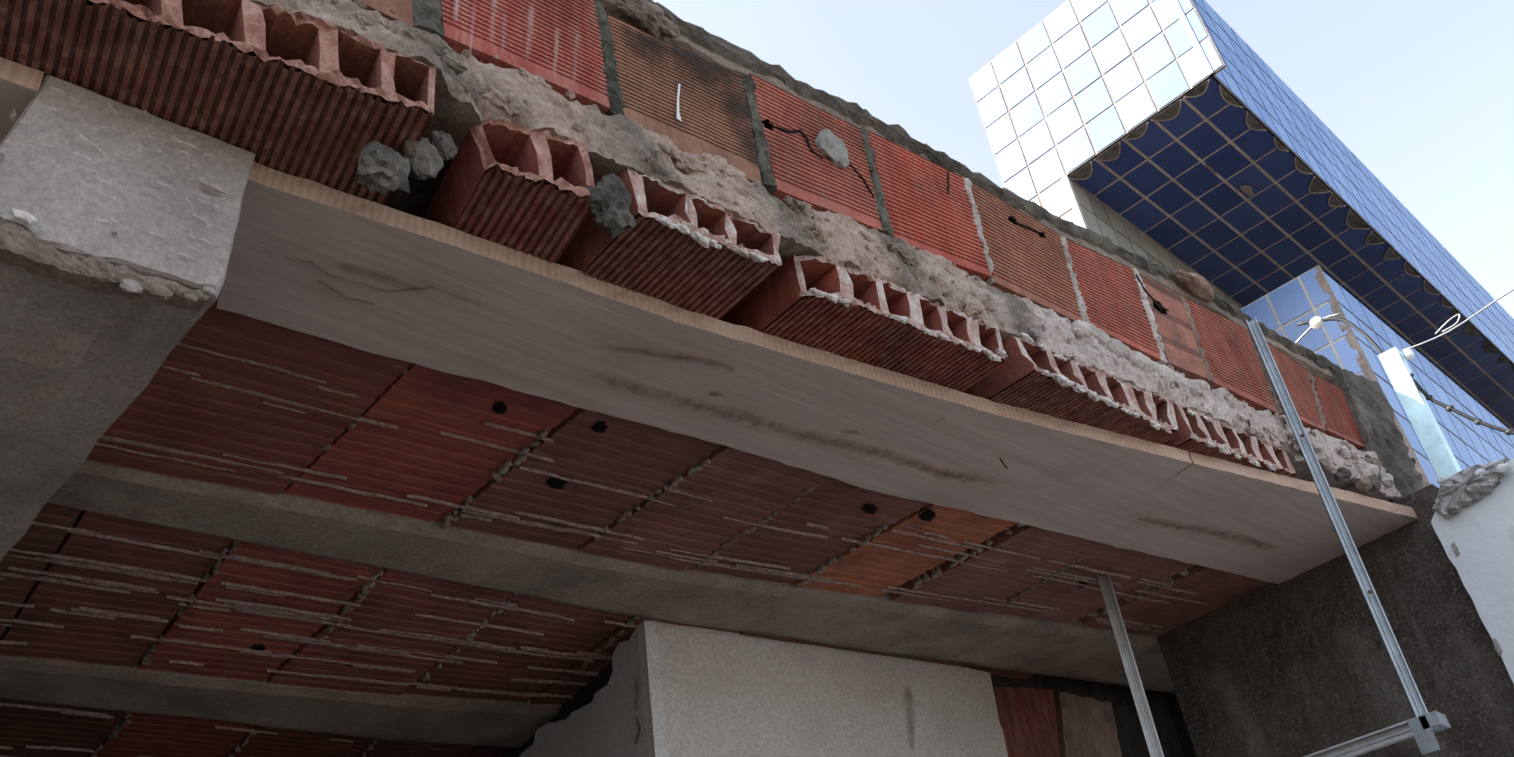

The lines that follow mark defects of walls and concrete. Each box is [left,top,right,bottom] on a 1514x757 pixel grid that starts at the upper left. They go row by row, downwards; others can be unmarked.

crack [771,126,874,197]
spalling [0,208,218,312]
crack [284,256,484,306]
spalling [1068,79,1514,372]
spalling [492,402,507,414]
spalling [590,420,608,433]
spalling [1311,265,1512,519]
spalling [545,474,569,489]